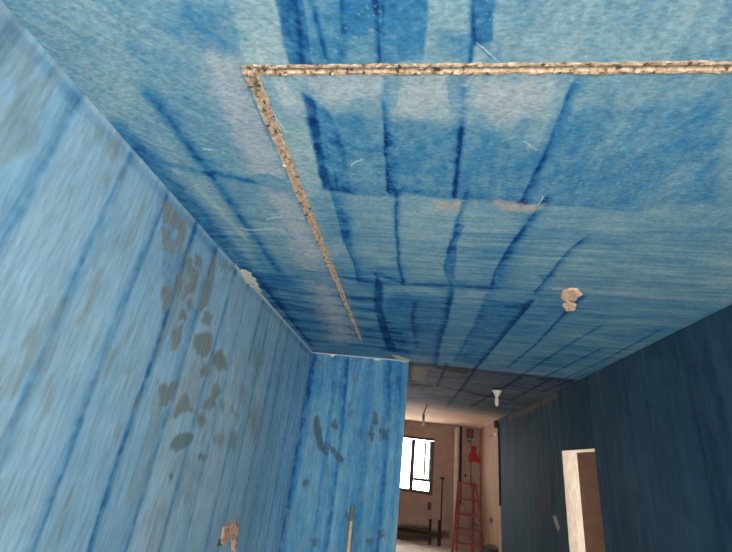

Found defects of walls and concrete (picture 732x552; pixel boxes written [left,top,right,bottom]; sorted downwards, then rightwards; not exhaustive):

spalling [560,288,583,312]
flaking render [156,196,264,464]
flaking render [217,519,240,552]